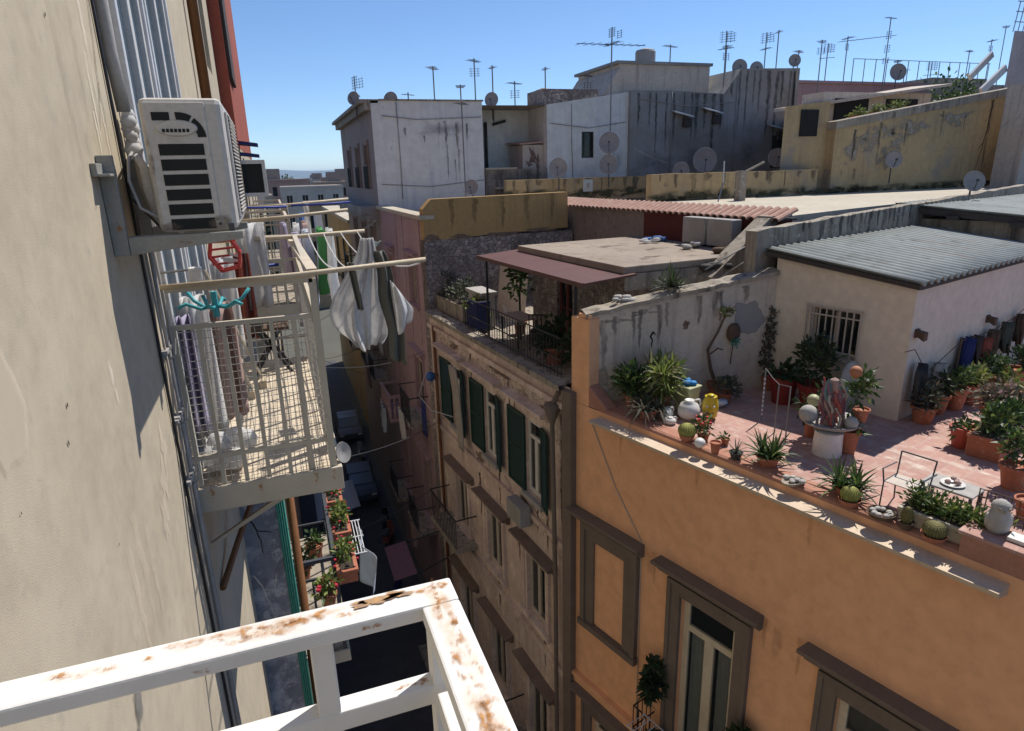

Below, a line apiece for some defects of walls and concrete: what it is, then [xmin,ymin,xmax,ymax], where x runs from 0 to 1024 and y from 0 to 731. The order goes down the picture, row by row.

damp [638,69,792,148]
crack [975,100,994,168]
corrosion [241,609,326,638]
corrosion [341,582,458,624]
corrosion [478,699,496,731]